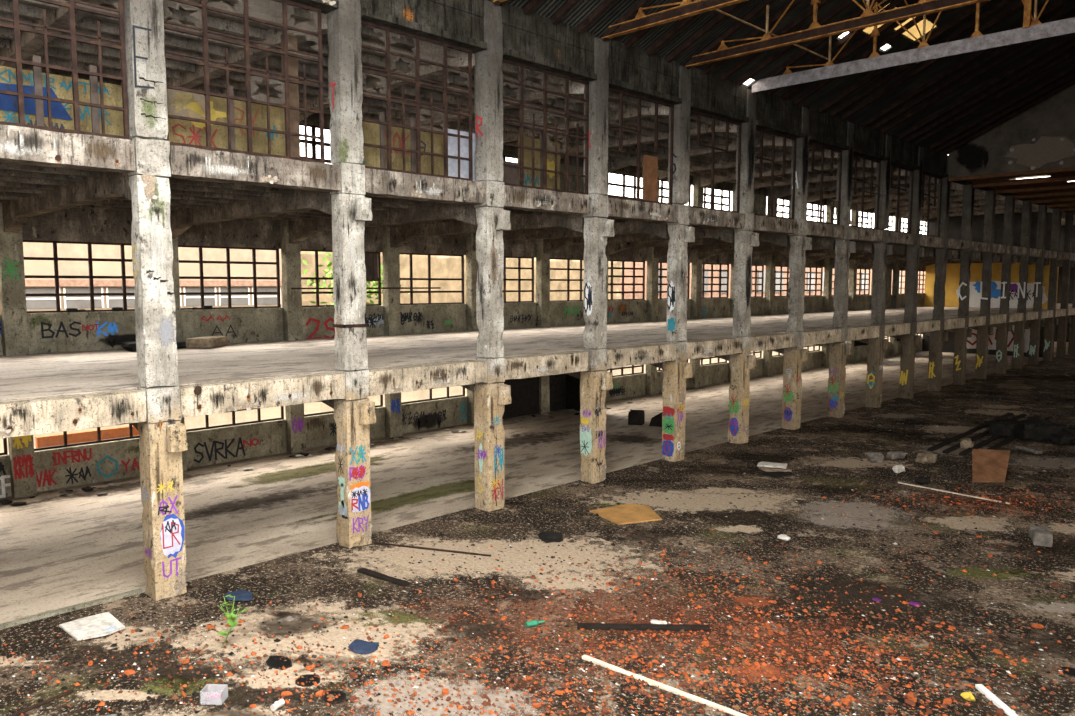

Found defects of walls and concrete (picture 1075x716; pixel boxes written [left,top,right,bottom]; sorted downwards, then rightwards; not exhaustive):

leakage [1,132,40,154]
leakage [88,142,115,162]
leakage [280,381,332,401]
leakage [3,407,34,428]
leakage [111,401,138,419]
leakage [351,380,362,446]